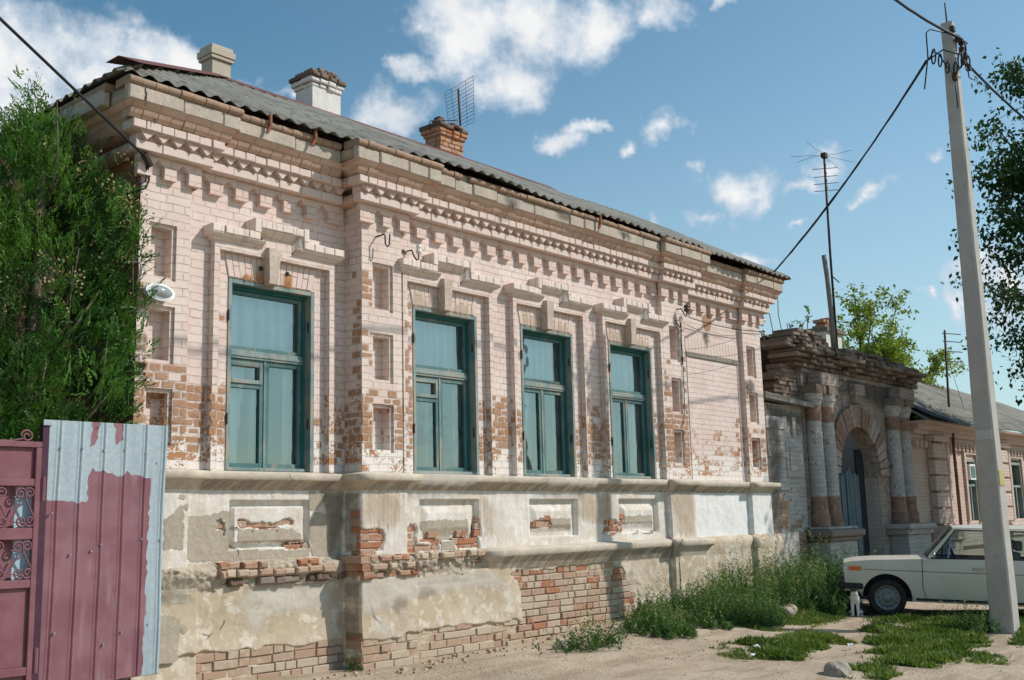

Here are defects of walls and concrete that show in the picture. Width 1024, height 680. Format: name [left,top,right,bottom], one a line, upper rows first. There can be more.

peeling [134,336,226,452]
peeling [479,395,523,461]
peeling [163,491,387,564]
peeling [400,516,482,563]
flaking render [503,562,638,646]